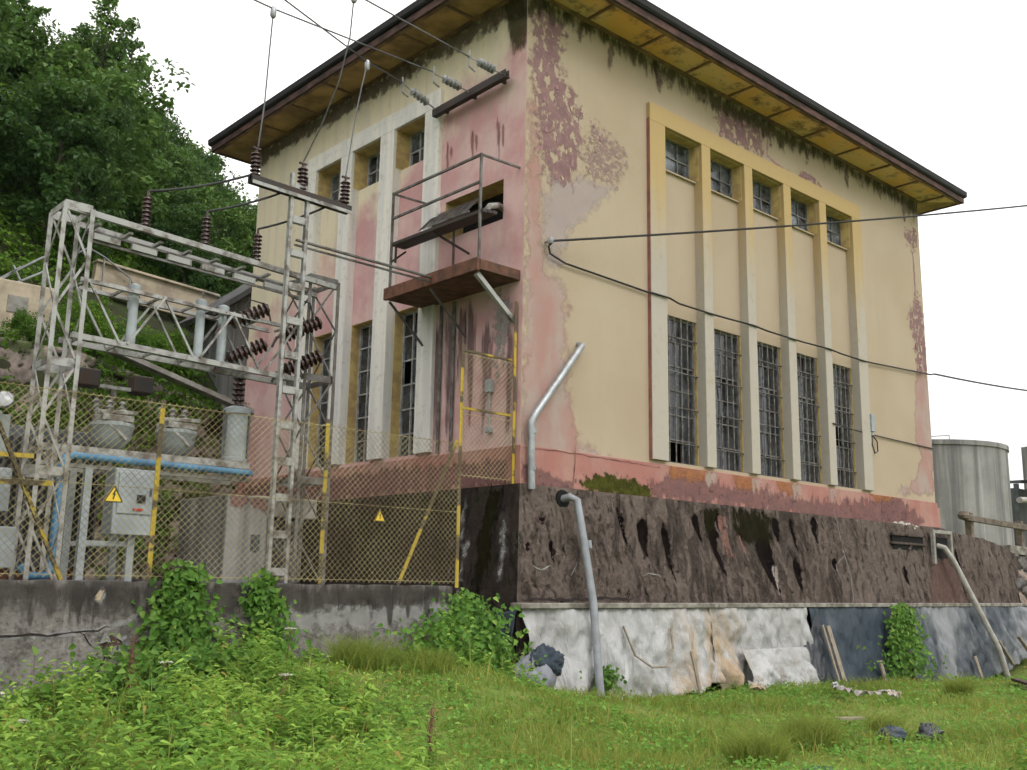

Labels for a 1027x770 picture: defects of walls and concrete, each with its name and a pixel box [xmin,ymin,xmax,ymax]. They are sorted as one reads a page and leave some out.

peeling [528,10,628,187]
damp [261,0,918,221]
spalling [715,105,764,156]
peeling [904,228,917,248]
peeling [908,291,927,374]
crack [0,626,108,646]